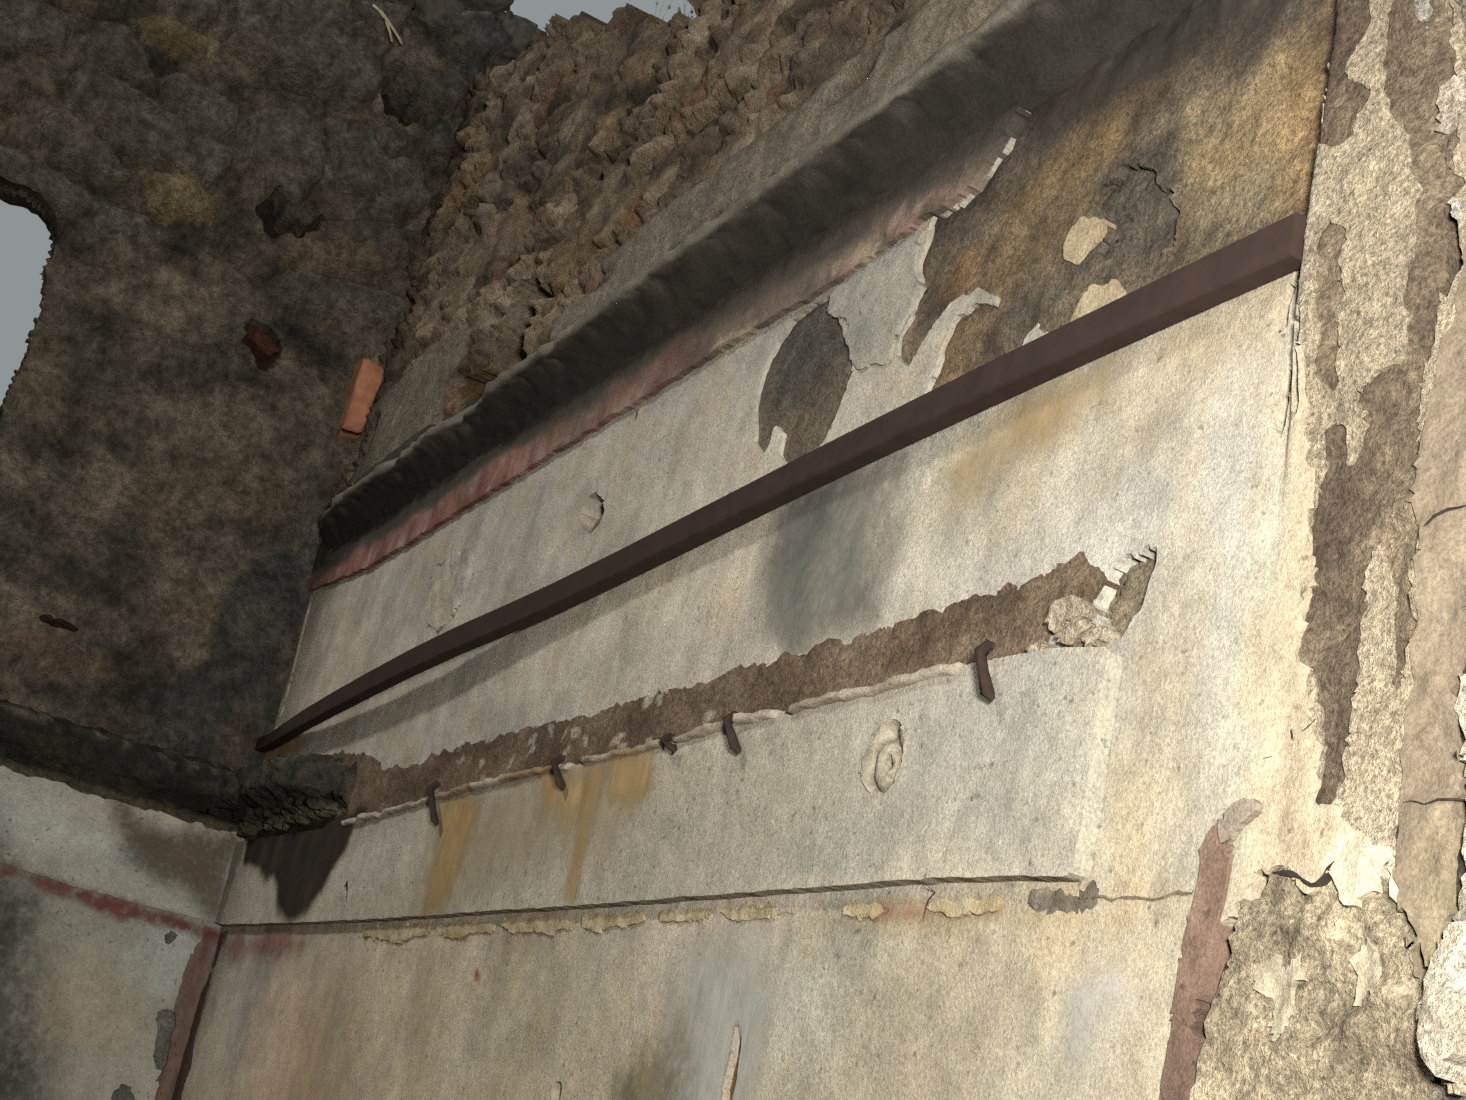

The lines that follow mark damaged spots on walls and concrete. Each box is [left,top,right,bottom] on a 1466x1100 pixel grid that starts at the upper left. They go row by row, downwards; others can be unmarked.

flaking render [758,0,1466,805]
crack [1423,505,1466,527]
crack [1457,662,1466,744]
corrosion [422,799,478,914]
corrosion [541,755,652,898]
crack [1403,797,1466,805]
crack [1454,843,1466,922]
peeling [362,904,798,944]
leakage [0,872,40,1100]
flaking render [1194,863,1441,1100]
flaking render [111,1084,135,1100]
spalling [729,1038,742,1100]